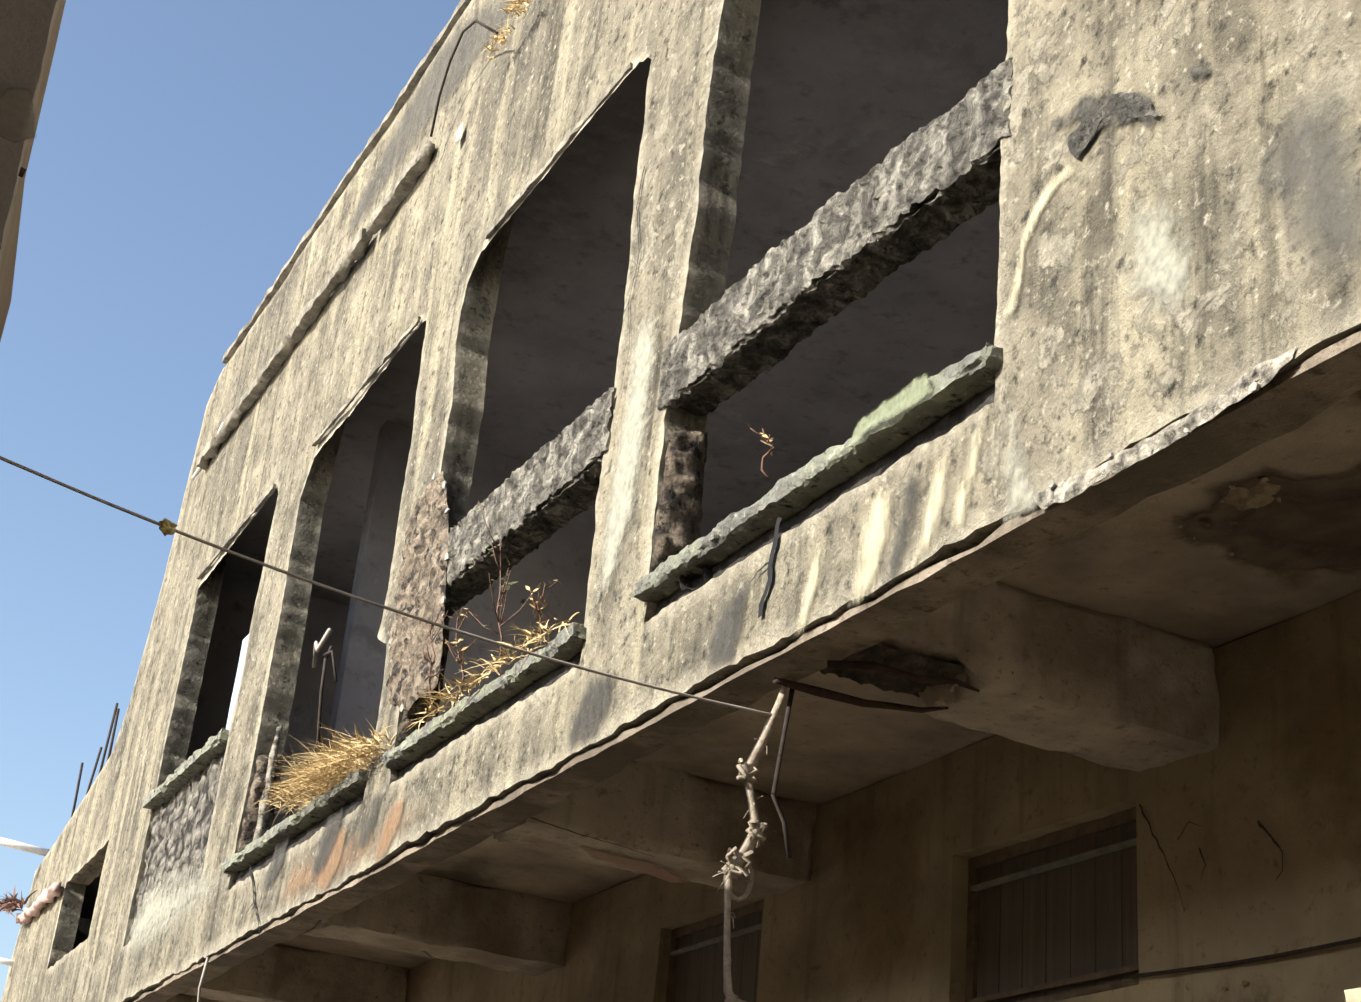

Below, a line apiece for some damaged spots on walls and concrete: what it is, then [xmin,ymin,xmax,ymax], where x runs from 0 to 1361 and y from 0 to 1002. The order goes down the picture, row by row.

spalling [772,644,980,713]
crack [1139,804,1206,910]
crack [1257,820,1283,881]